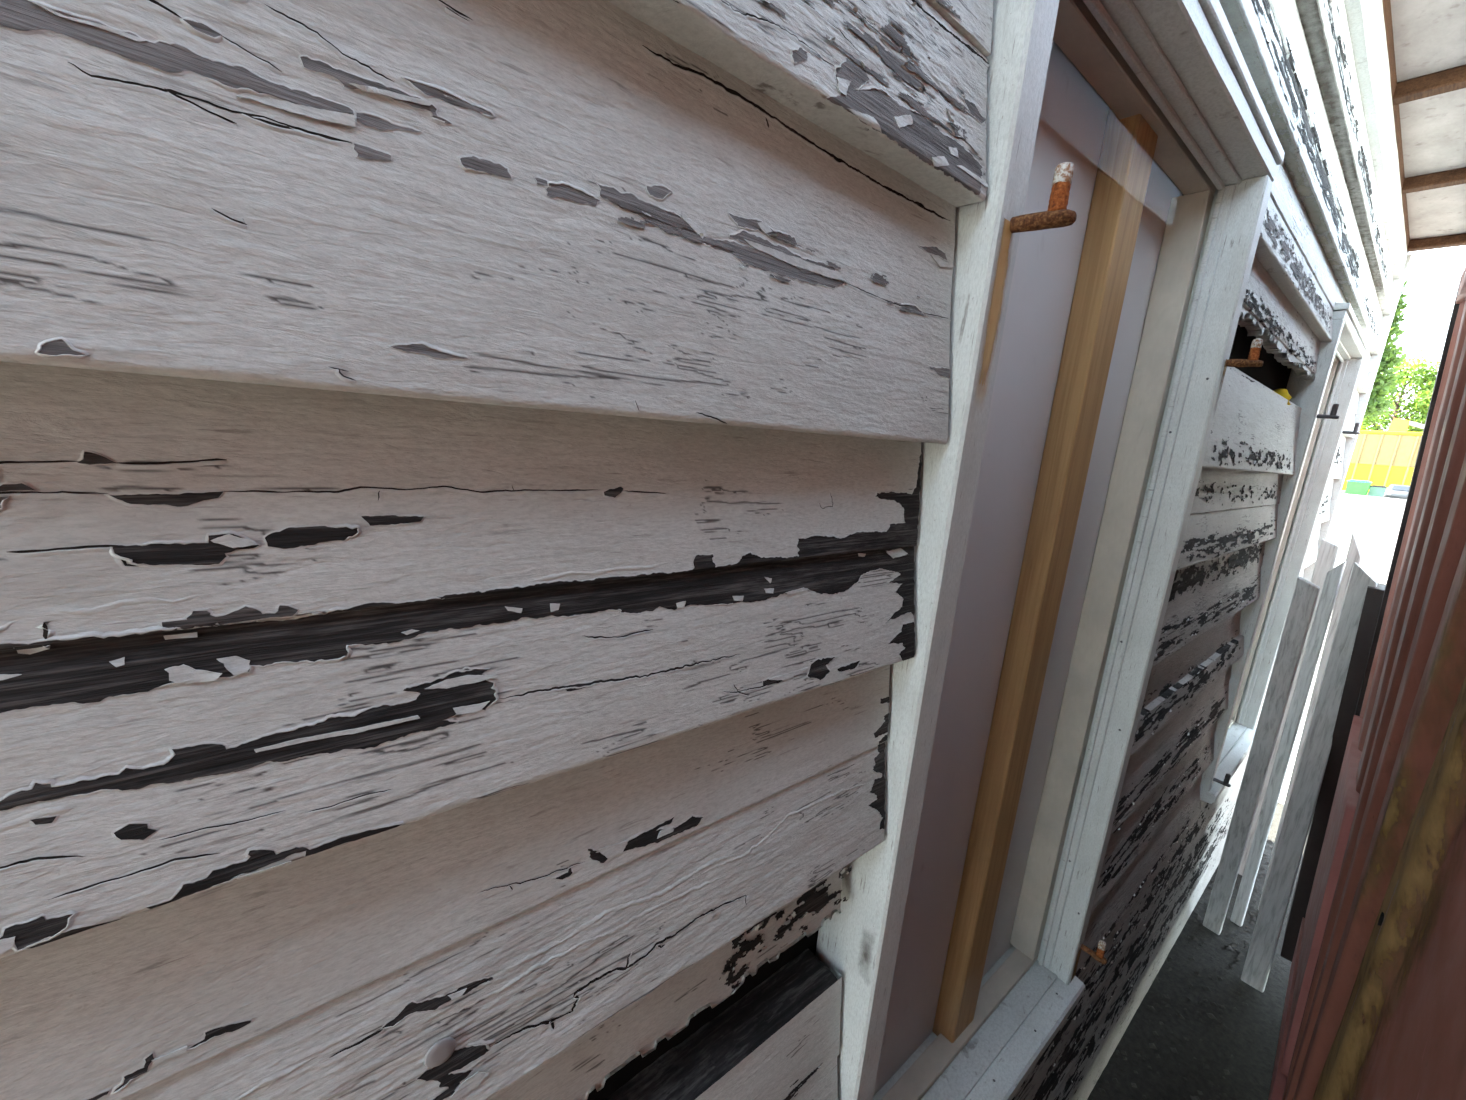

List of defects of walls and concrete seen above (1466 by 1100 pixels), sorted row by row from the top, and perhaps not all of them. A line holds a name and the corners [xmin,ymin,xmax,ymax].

peeling [0,0,496,162]
peeling [533,176,849,290]
crack [642,45,950,223]
peeling [790,0,989,197]
peeling [1252,0,1391,347]
peeling [0,450,922,716]
peeling [1153,430,1291,662]
peeling [0,667,499,827]
peeling [868,696,890,830]
peeling [0,911,125,954]
peeling [145,821,407,909]
peeling [719,866,852,995]